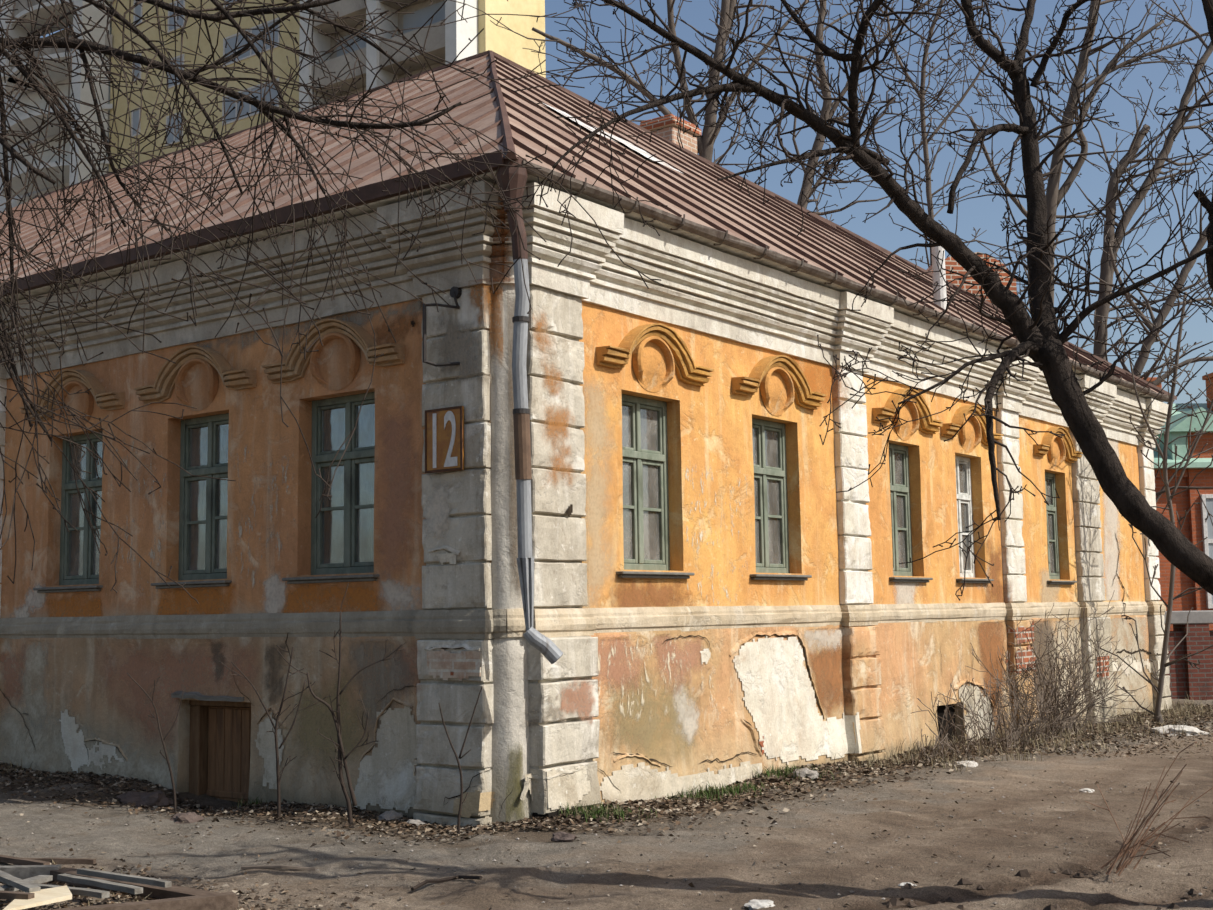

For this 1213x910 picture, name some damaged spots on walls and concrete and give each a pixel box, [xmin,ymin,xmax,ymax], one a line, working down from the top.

peeling [0,641,174,789]
spalling [255,705,287,791]
spalling [351,643,493,813]
leakage [614,679,699,755]
spalling [520,627,862,810]
spalling [954,678,995,741]
peeling [1006,617,1160,719]